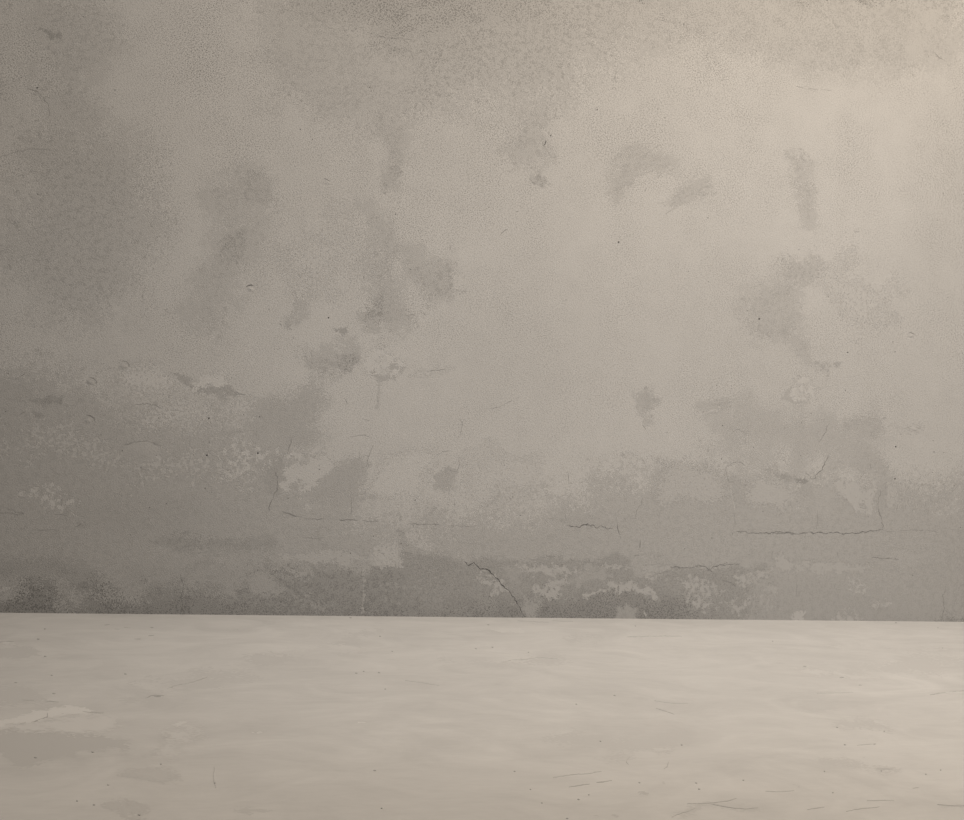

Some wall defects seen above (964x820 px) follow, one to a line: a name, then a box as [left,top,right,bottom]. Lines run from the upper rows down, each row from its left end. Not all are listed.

leakage [0,0,964,622]
crack [736,491,936,555]
crack [464,561,525,617]
peeling [515,558,781,620]